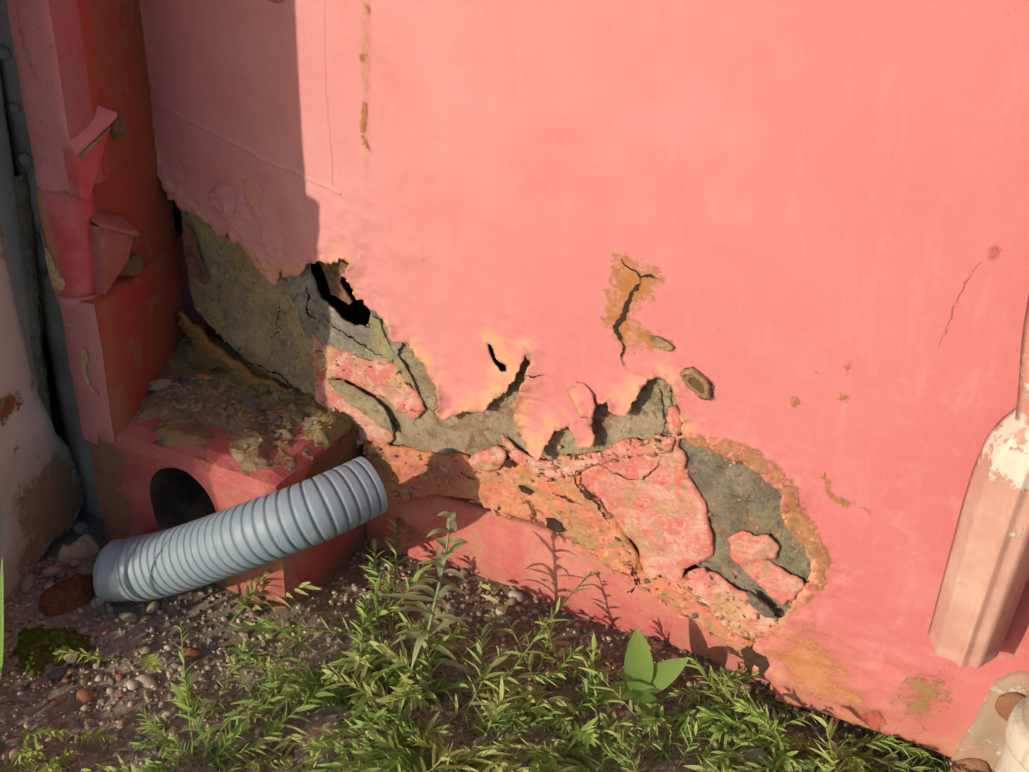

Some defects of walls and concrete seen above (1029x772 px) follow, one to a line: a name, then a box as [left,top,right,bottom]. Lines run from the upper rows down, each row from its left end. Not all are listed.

corrosion [359,102,370,151]
crack [600,252,674,367]
corrosion [0,380,35,427]
corrosion [134,310,342,451]
spalling [180,210,811,641]
crack [552,380,667,522]
corrosion [305,426,871,718]